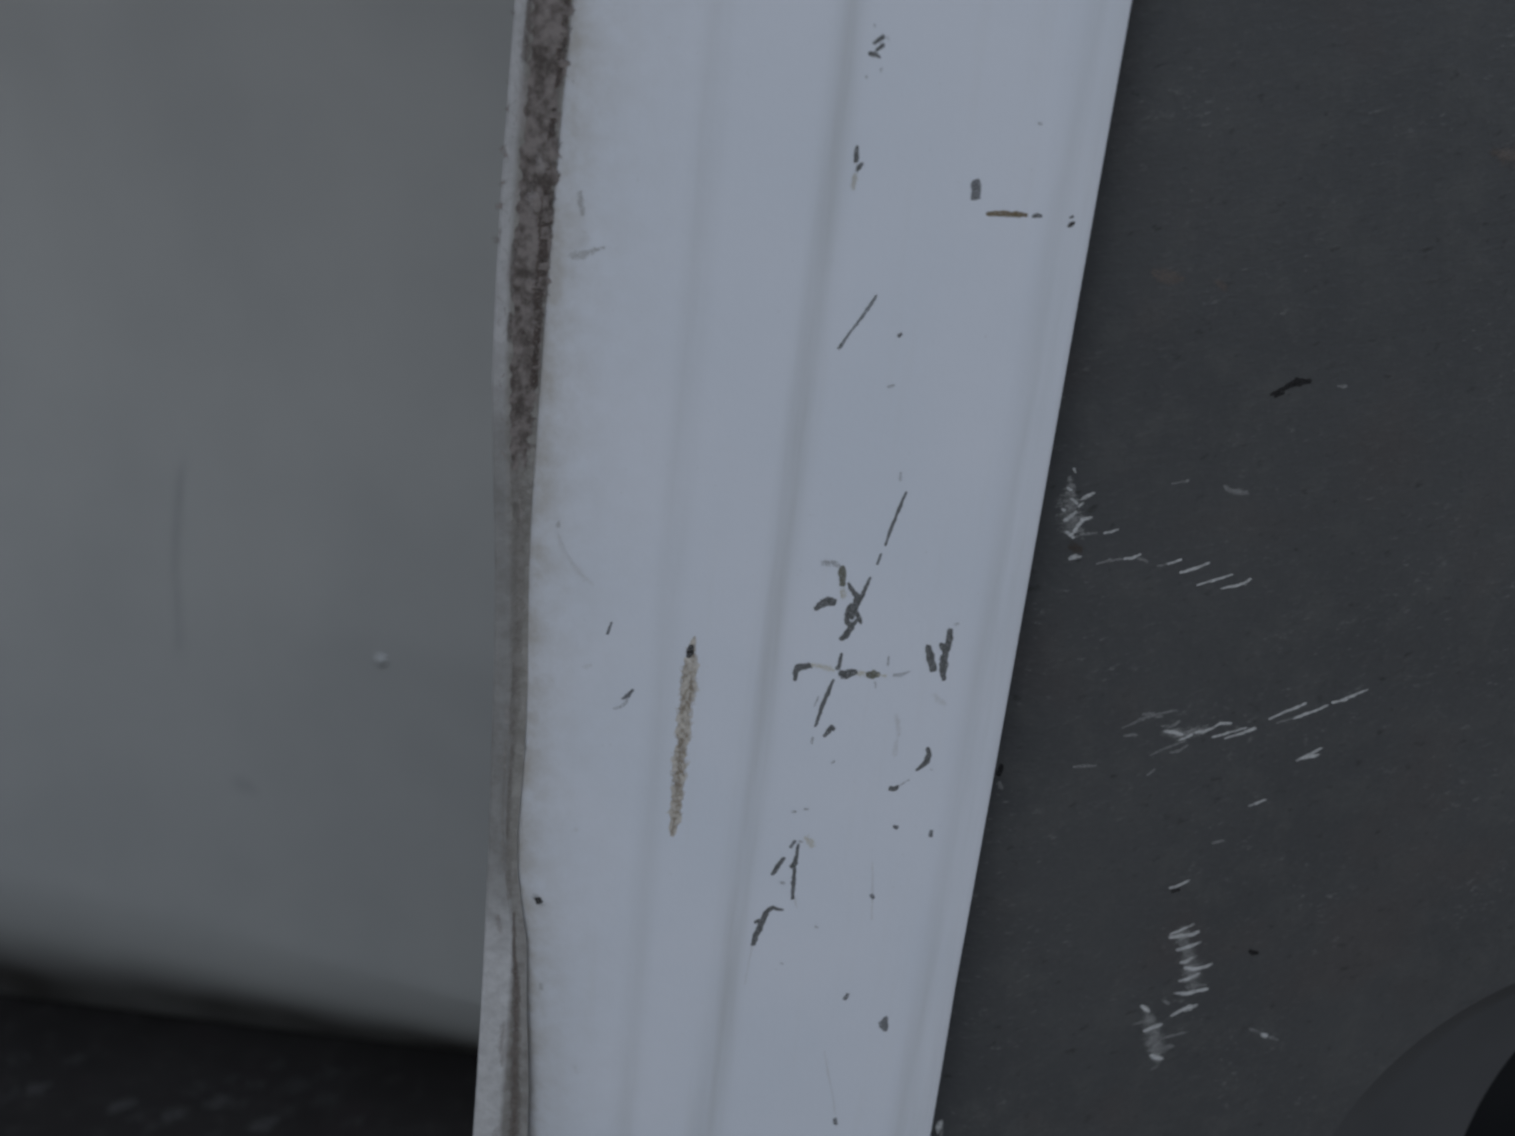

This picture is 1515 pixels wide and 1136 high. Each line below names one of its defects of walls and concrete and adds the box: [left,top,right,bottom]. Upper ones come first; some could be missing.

peeling [792,560,911,688]
peeling [925,622,959,681]